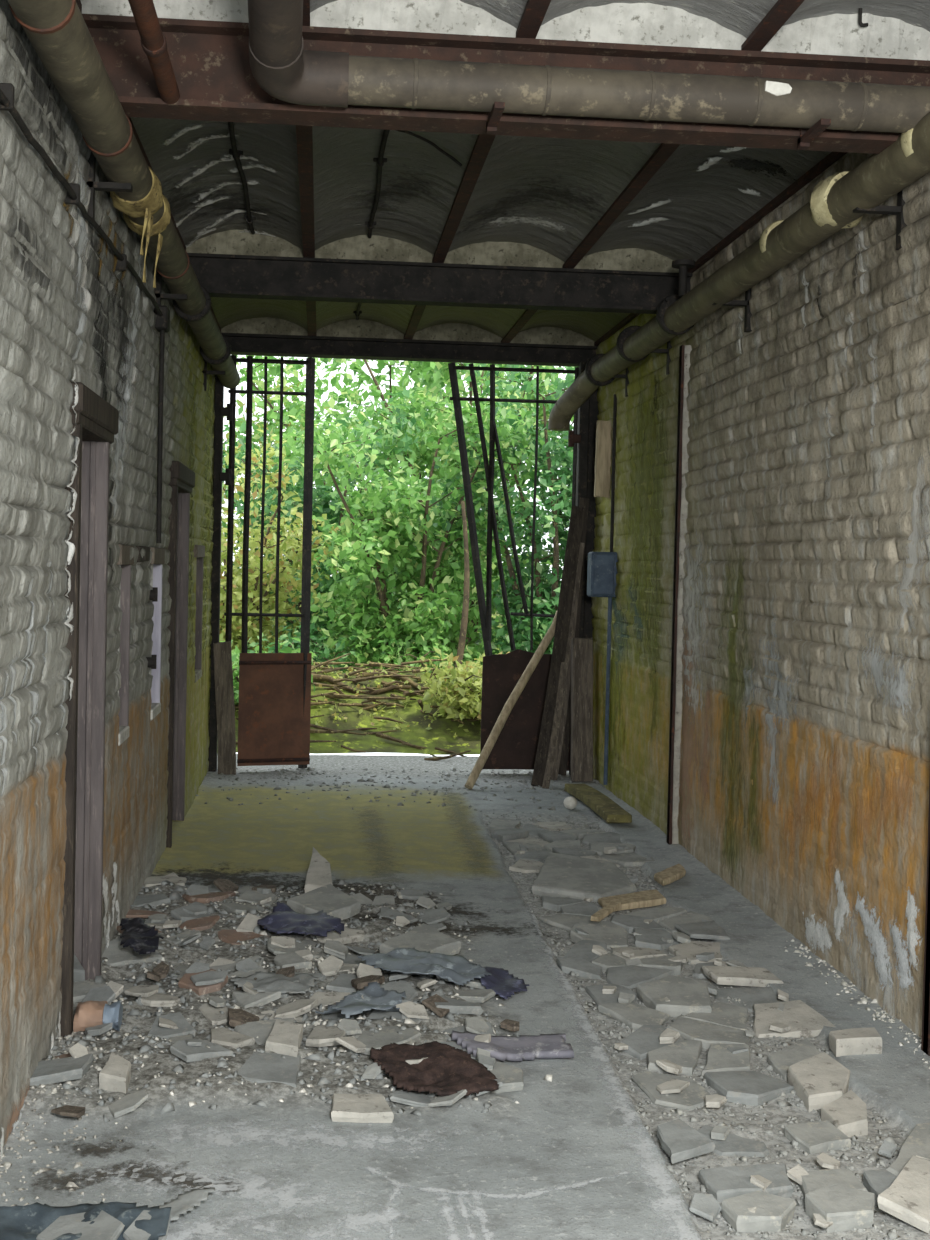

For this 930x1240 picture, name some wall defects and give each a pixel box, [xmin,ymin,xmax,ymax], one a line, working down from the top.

water stain [605,534,797,862]